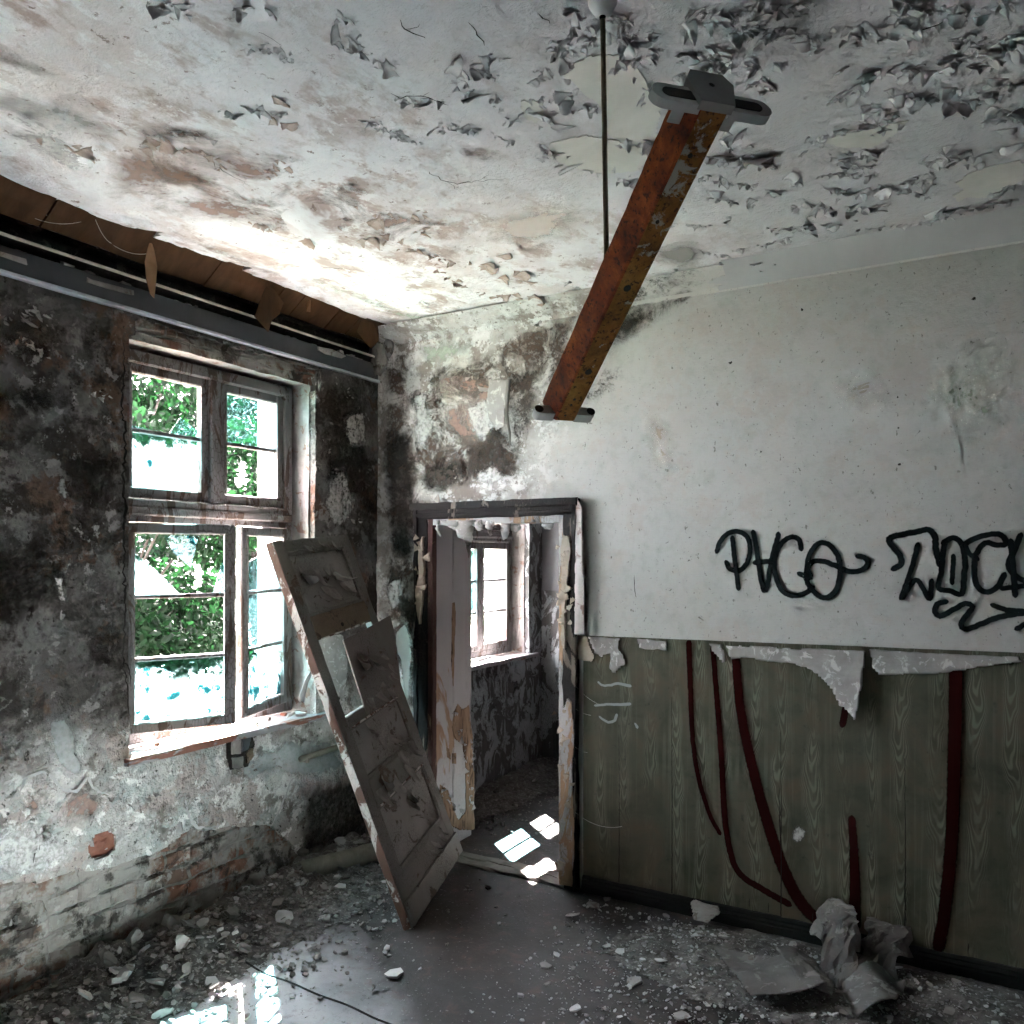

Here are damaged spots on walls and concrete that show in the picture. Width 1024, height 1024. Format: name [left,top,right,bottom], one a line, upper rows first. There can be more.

damp [122,157,285,224]
damp [158,130,273,178]
peeling [218,96,299,132]
peeling [356,210,545,307]
peeling [358,0,1024,272]
crack [119,343,131,715]
damp [327,377,365,524]
damp [384,323,568,710]
damp [304,781,365,854]
peeling [427,704,476,851]
peeling [551,698,575,887]
spalling [0,787,298,1001]